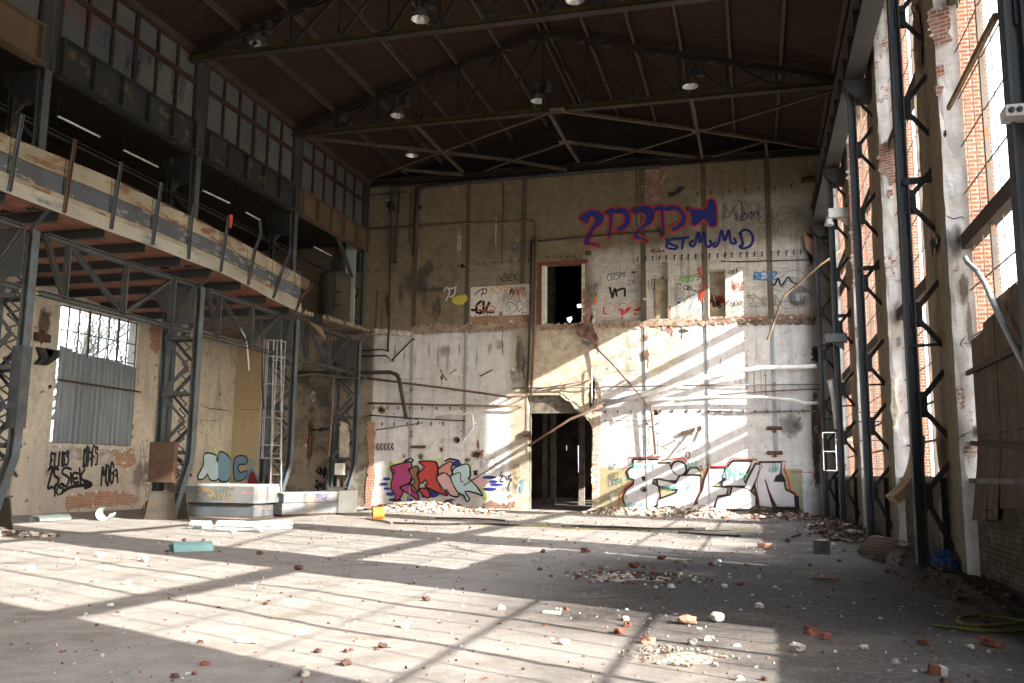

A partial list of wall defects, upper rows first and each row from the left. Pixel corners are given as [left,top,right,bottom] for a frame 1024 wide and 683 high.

spalling [911,4,953,73]
spalling [876,140,896,198]
spalling [148,324,161,354]
flaking render [51,445,138,470]
spalling [364,405,388,507]
spalling [65,488,137,510]